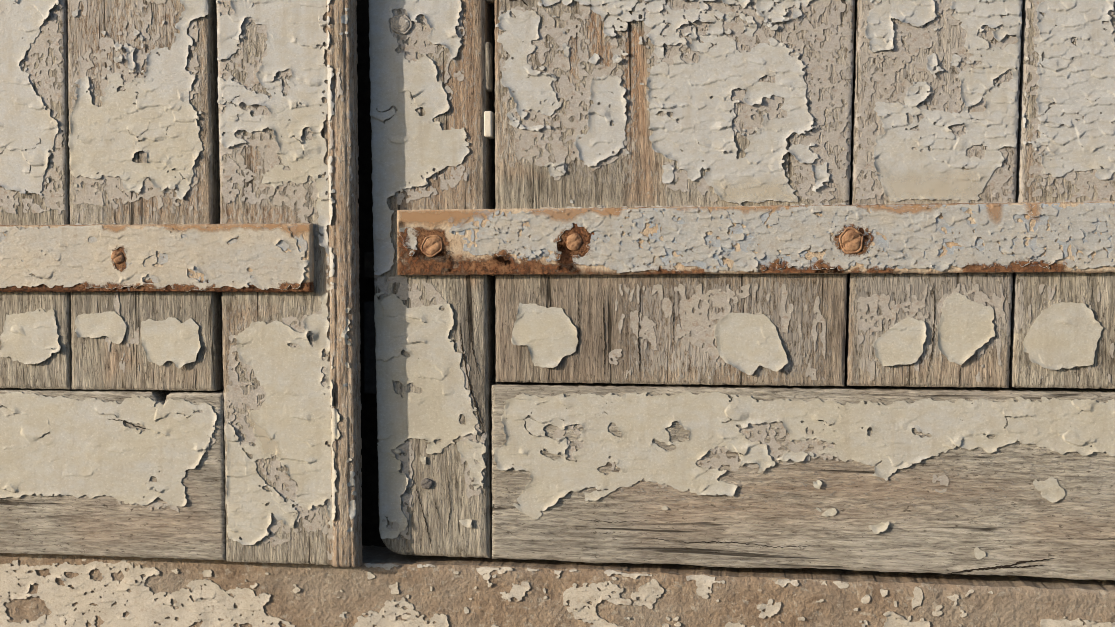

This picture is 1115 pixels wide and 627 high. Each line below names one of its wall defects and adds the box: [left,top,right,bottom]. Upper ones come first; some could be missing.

corrosion [78,246,215,291]
peeling [0,0,356,560]
corrosion [278,282,310,291]
corrosion [397,208,621,275]
corrosion [647,266,704,274]
peeling [369,0,1115,540]
corrosion [761,224,894,273]
corrosion [963,260,1067,272]
peeling [0,559,295,627]
peeling [339,582,449,627]
peeling [464,567,548,614]
peeling [554,569,664,627]